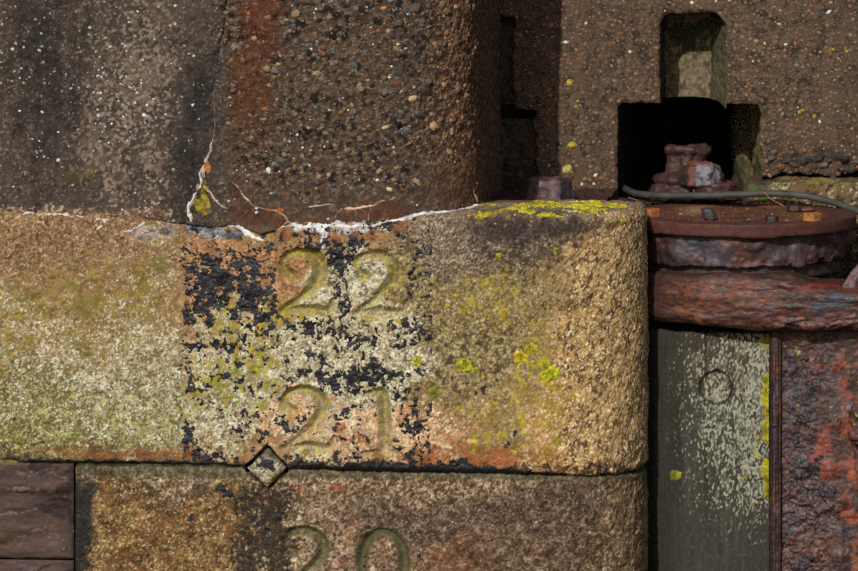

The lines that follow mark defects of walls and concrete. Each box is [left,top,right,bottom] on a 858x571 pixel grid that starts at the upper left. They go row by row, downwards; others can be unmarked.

crack [178,0,290,230]
crack [309,197,394,221]